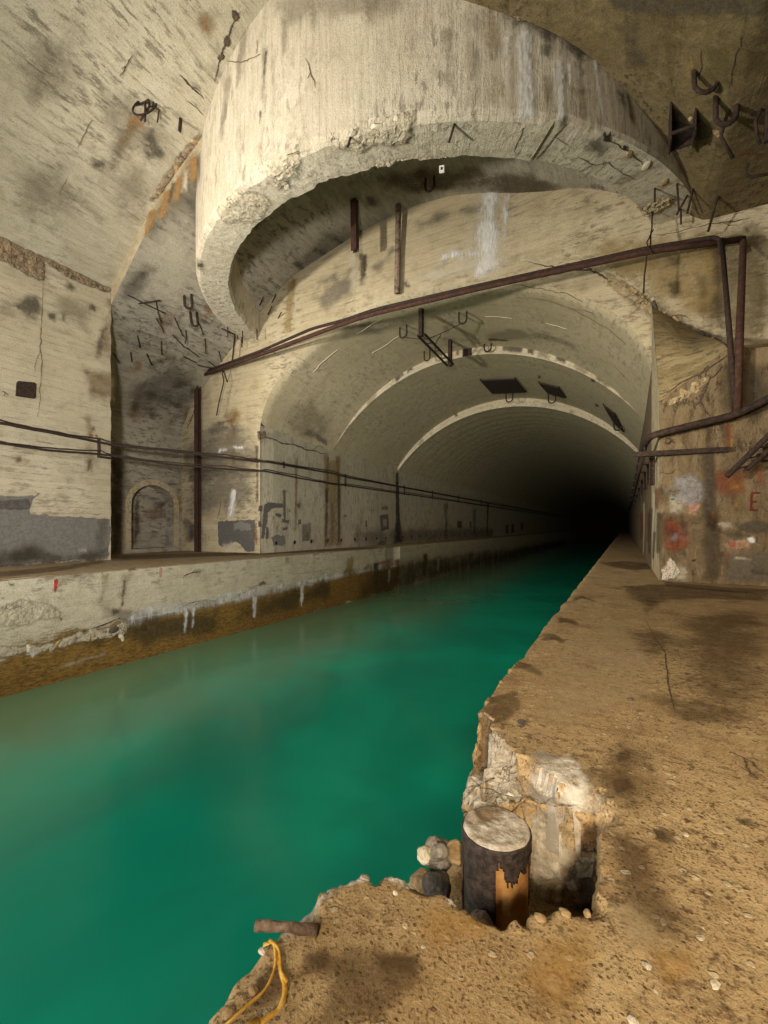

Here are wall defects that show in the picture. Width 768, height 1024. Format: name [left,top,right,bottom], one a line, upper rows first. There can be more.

leakage [505,21,603,121]
spalling [0,236,111,292]
corrosion [145,159,197,232]
spalling [216,144,300,224]
spalling [328,110,447,172]
leakage [381,169,552,276]
spalling [659,355,727,405]
leakage [0,540,566,698]
crack [637,623,696,710]
spalling [462,730,527,819]